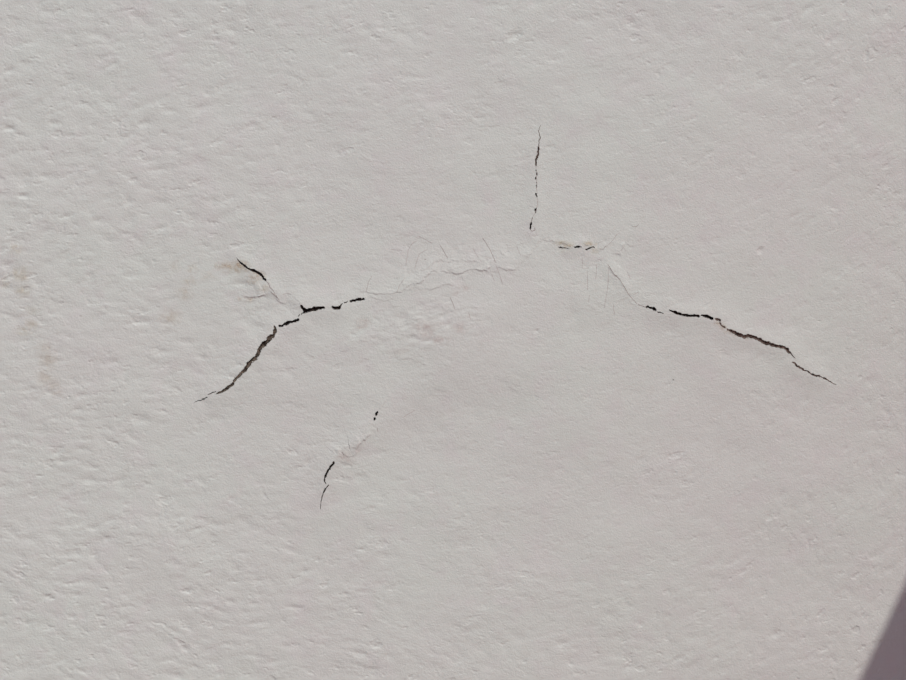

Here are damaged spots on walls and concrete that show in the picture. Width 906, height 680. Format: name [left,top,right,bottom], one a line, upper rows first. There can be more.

crack [530,125,541,231]
crack [236,257,278,298]
crack [196,298,364,402]
crack [638,304,836,385]
crack [320,461,334,509]